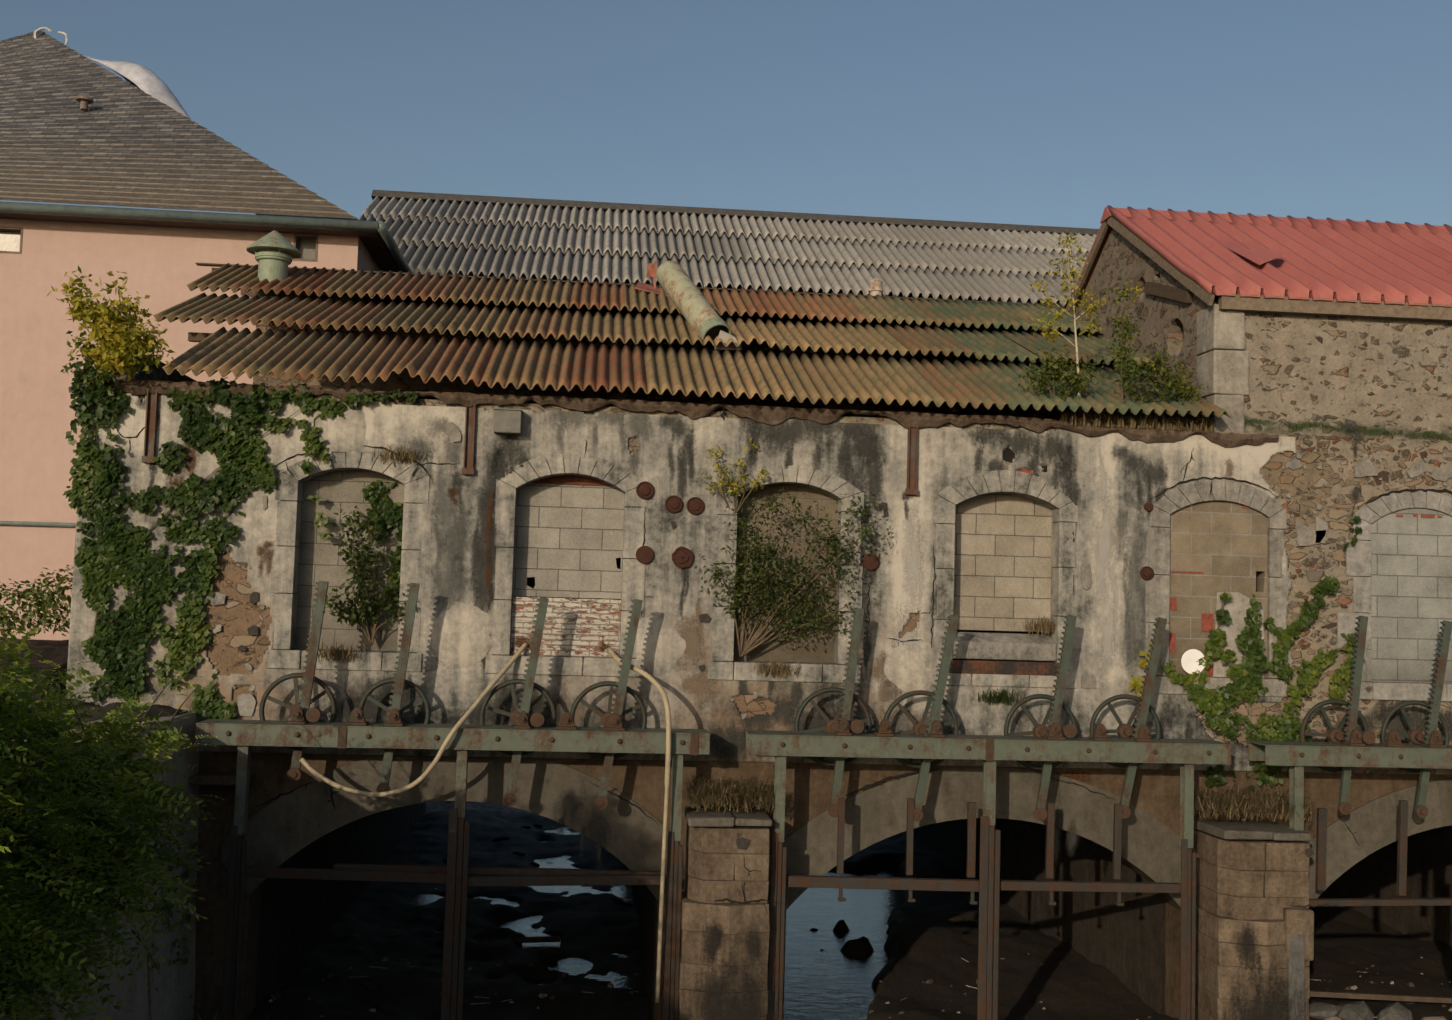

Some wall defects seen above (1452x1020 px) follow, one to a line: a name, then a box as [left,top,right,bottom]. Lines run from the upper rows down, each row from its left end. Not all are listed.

leakage [411,420,530,611]
leakage [970,428,1080,506]
spalling [200,548,272,710]